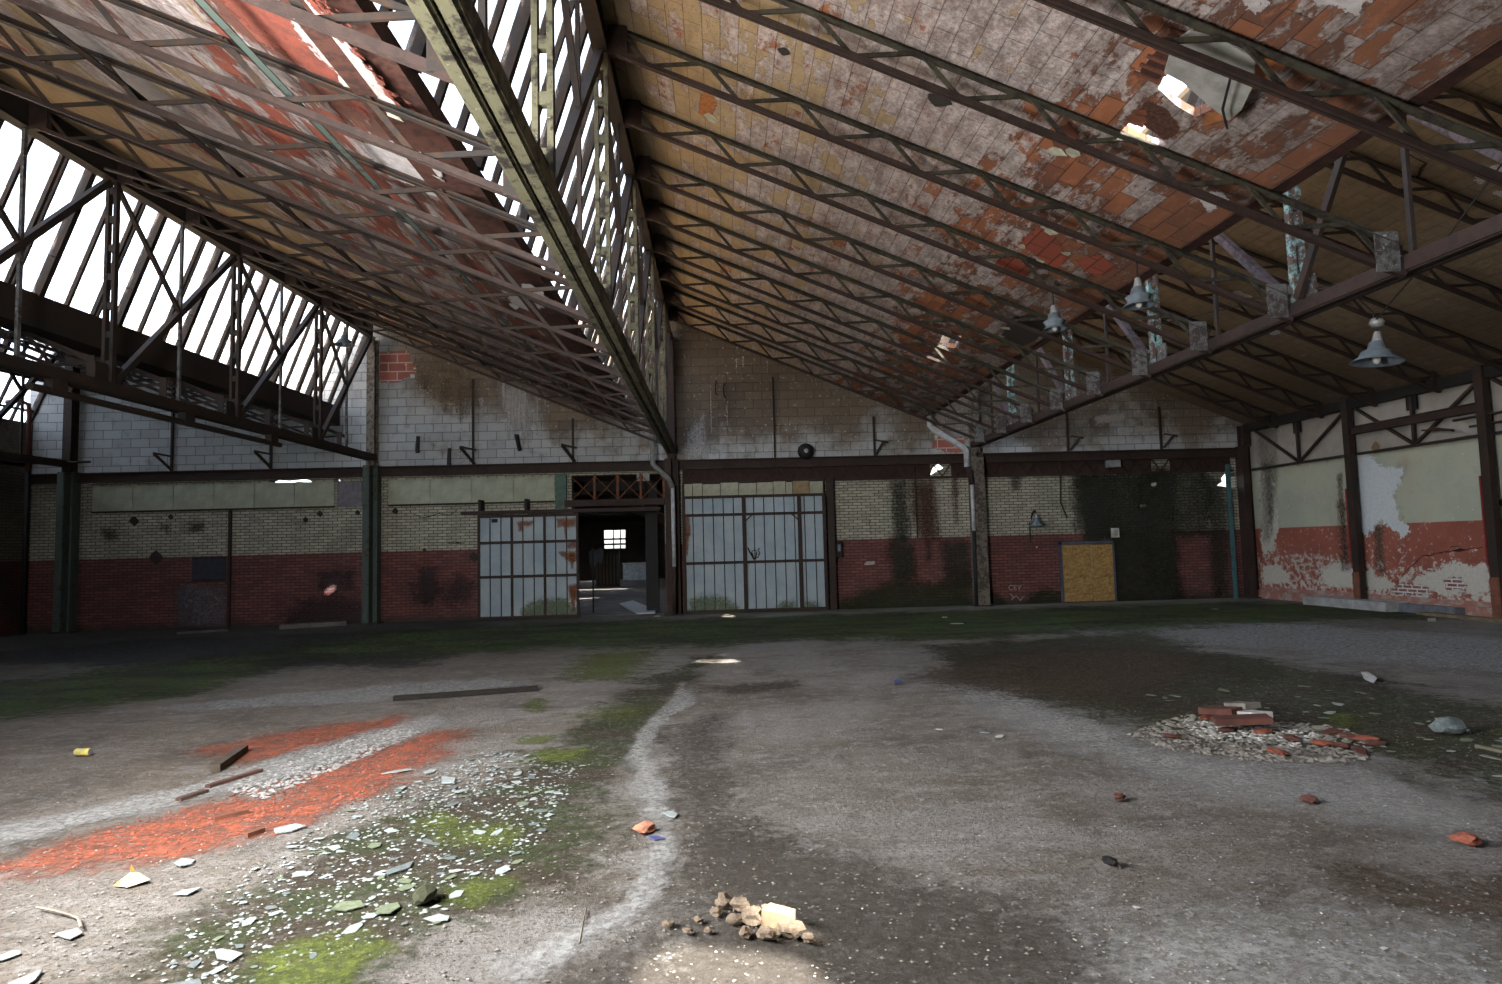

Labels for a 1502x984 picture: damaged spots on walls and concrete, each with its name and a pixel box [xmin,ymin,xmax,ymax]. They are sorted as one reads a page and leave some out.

spalling [1132,27,1185,84]
peeling [1047,147,1081,158]
spalling [1125,101,1179,143]
spalling [1202,56,1286,126]
leakage [480,383,547,446]
peeling [1356,441,1412,539]
peeling [1257,465,1490,599]